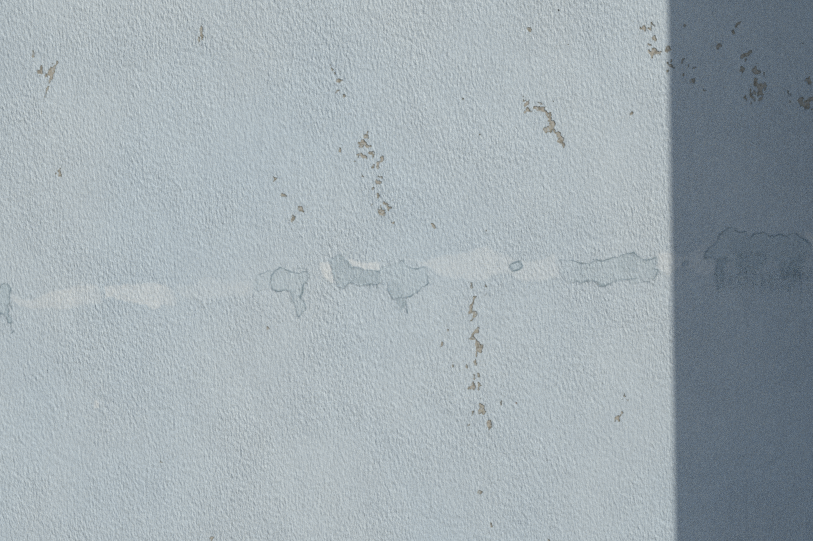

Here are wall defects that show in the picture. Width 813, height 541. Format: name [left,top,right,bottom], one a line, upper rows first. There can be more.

peeling [37,61,58,98]
peeling [639,22,696,83]
peeling [739,50,767,104]
peeling [523,96,565,148]
peeling [354,131,395,224]
leakage [252,266,311,318]
leakage [329,254,429,313]
leakage [559,251,660,287]
leakage [703,227,812,278]
peeling [465,283,492,430]